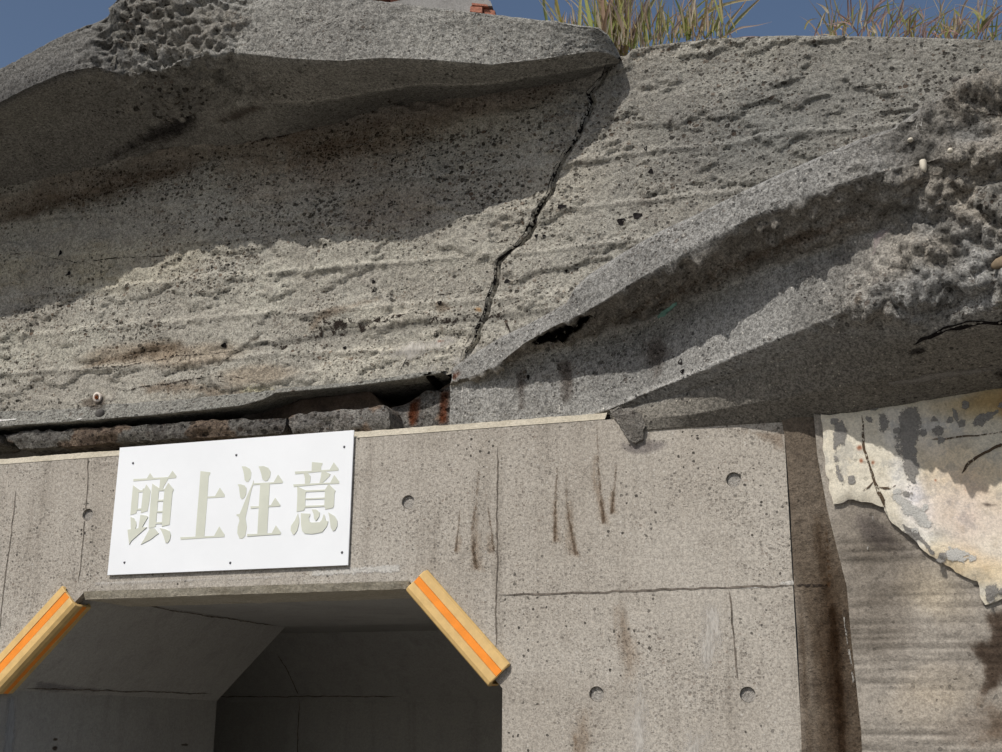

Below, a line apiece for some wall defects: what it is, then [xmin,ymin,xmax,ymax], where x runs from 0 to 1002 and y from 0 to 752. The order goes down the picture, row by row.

spalling [108,0,252,124]
crack [271,59,615,357]
crack [914,309,1002,345]
crack [70,350,255,391]
peeling [830,418,856,485]
peeling [866,400,1002,563]
peeling [984,584,1002,603]
water stain [975,614,1002,691]